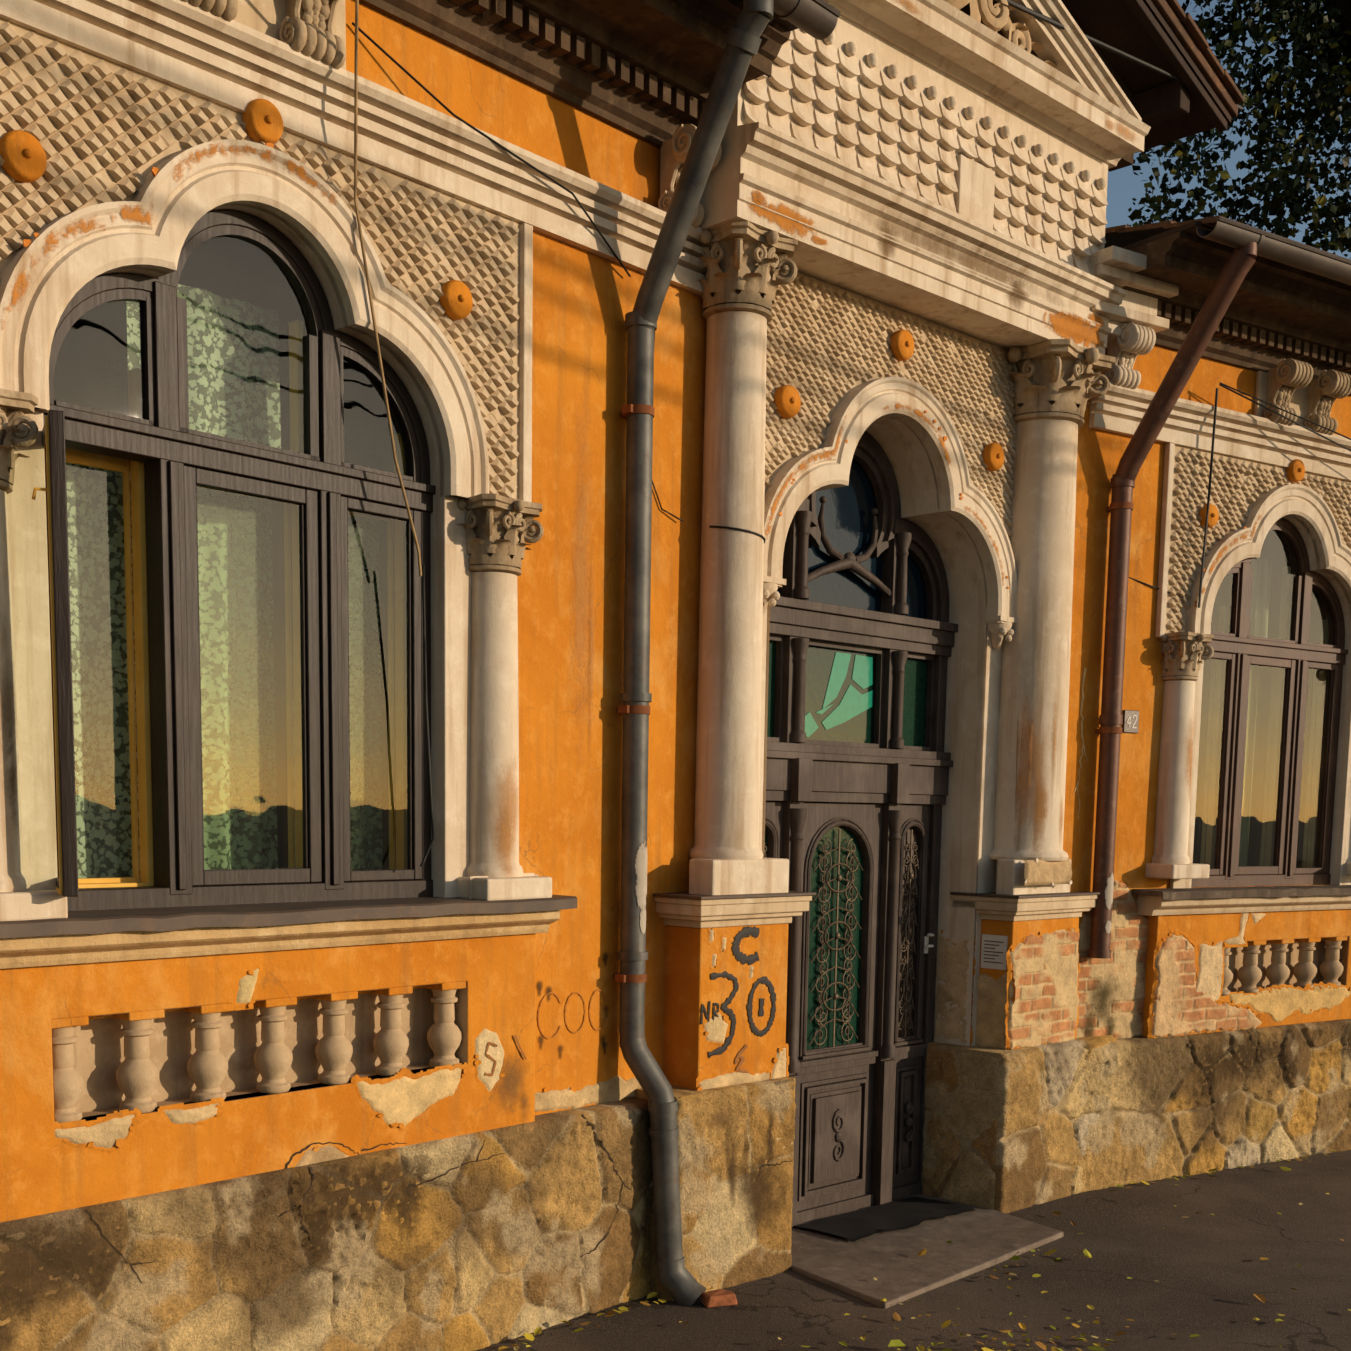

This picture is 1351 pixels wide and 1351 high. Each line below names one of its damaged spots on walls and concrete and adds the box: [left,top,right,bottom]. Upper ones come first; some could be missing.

flaking render [934,879,1351,1050]
flaking render [54,1108,142,1153]
flaking render [158,1097,224,1126]
flaking render [351,1028,506,1131]
flaking render [702,1013,730,1046]
crack [278,1142,407,1243]